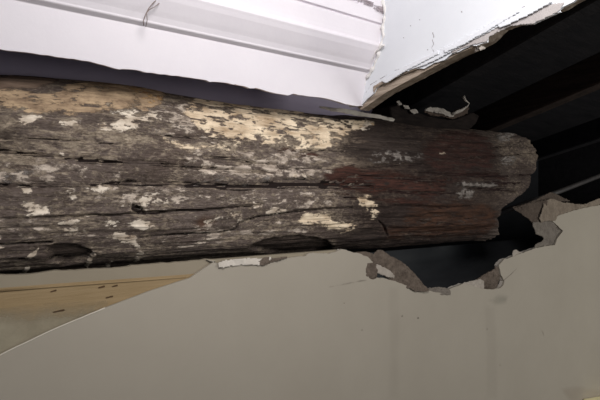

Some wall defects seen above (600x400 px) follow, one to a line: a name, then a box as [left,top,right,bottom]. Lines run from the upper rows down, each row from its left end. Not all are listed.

peeling [373,0,564,92]
crack [0,138,80,157]
peeling [0,81,375,211]
peeling [0,202,51,241]
spalling [48,216,97,268]
peeling [106,219,155,262]
crack [0,146,530,235]
spalling [177,188,355,268]
peeling [357,195,379,220]
flaking render [513,192,600,249]
flaking render [355,250,451,295]
flaking render [463,266,500,289]